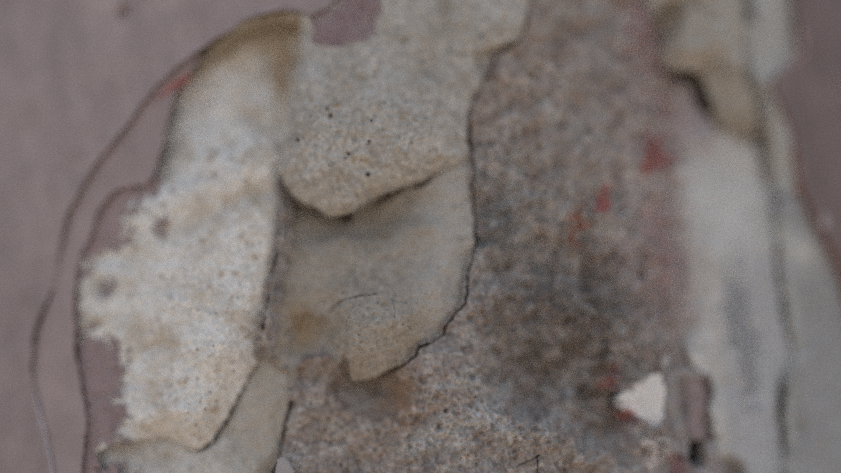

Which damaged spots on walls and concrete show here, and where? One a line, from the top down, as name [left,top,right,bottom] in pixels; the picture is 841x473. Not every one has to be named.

crack [375,174,440,202]
crack [466,131,474,184]
spalling [74,12,301,473]
spalling [654,130,794,473]
peeling [623,419,670,470]
crack [776,375,786,455]